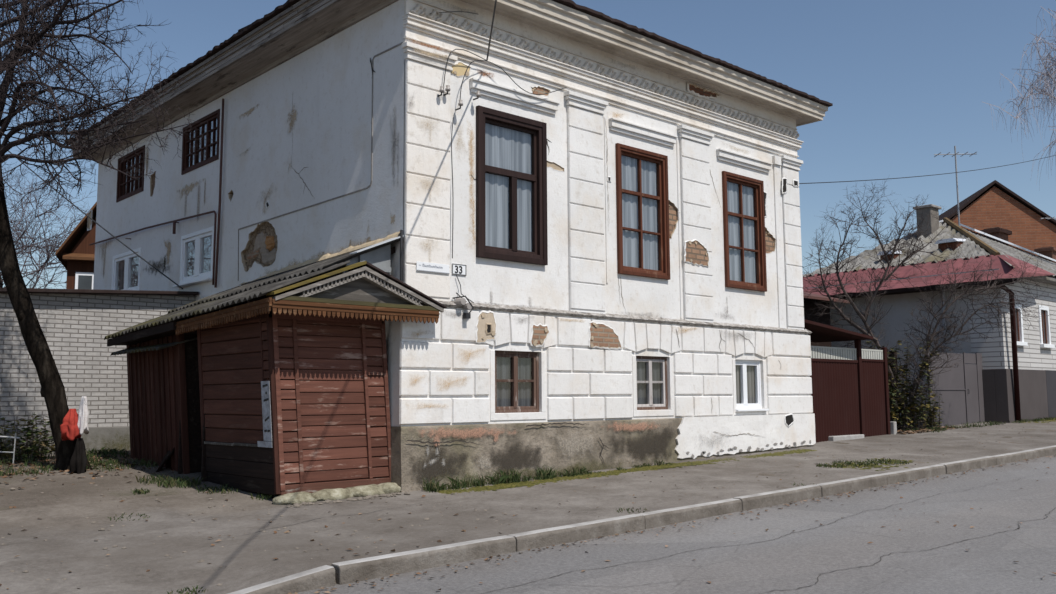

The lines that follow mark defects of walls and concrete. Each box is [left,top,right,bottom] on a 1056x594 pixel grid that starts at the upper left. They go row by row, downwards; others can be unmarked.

spalling [782,177,799,194]
spalling [241,200,278,272]
spalling [669,200,678,239]
spalling [764,191,776,254]
spalling [684,239,709,267]
spalling [475,310,496,343]
spalling [530,323,550,347]
spalling [589,321,622,350]
damp [413,447,478,482]
damp [492,442,543,472]
damp [613,429,674,460]